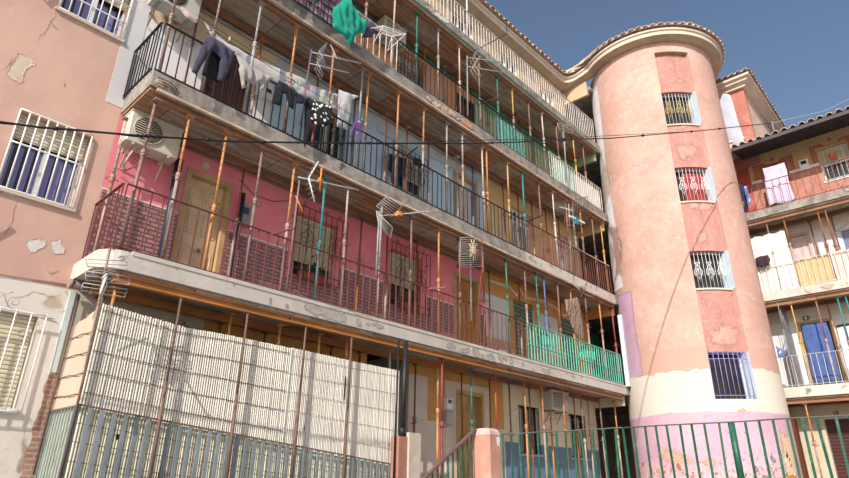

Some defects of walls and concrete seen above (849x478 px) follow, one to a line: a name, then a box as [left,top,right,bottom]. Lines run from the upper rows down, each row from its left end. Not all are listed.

peeling [6,53,36,85]
peeling [26,238,65,254]
peeling [304,303,346,323]
peeling [447,342,551,375]
flaking render [20,374,58,478]
peeling [745,428,797,478]